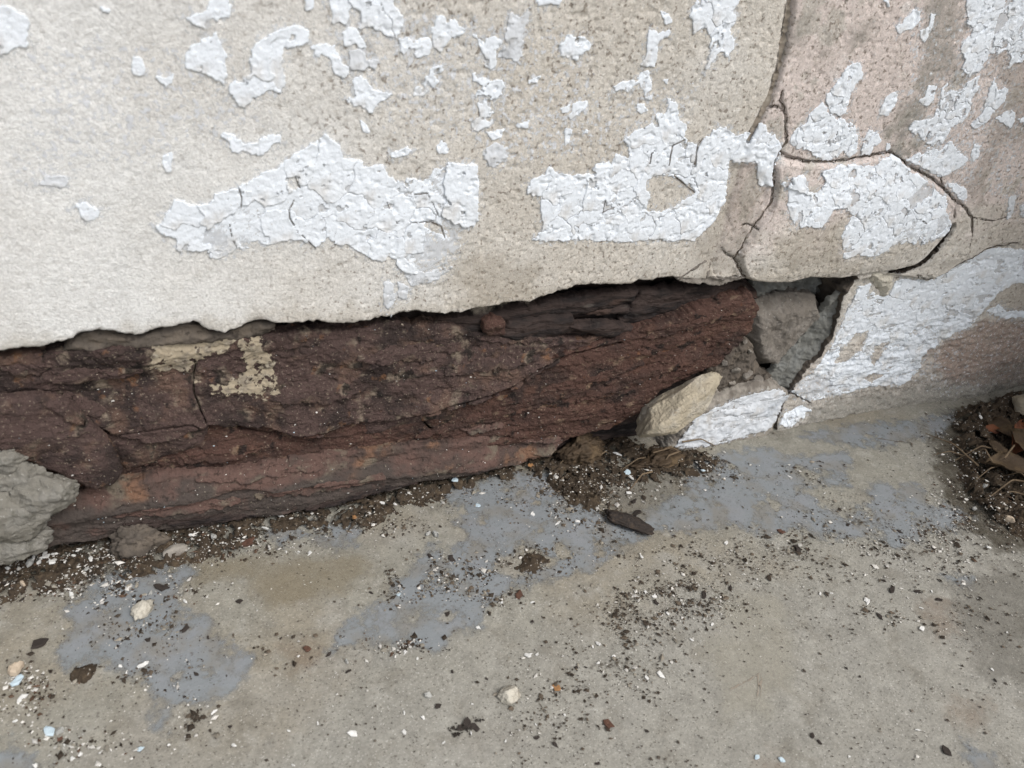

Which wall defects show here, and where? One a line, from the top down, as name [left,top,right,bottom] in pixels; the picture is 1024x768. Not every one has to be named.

peeling [131,0,1024,316]
crack [721,90,1020,280]
rust [493,276,683,306]
rust [380,310,436,319]
flaking render [63,319,275,351]
rust [31,367,143,386]
rust [656,373,697,397]
peeling [0,391,123,489]
rust [590,413,640,441]
peeling [332,247,1024,652]
peeling [266,523,362,548]
rust [605,509,655,535]